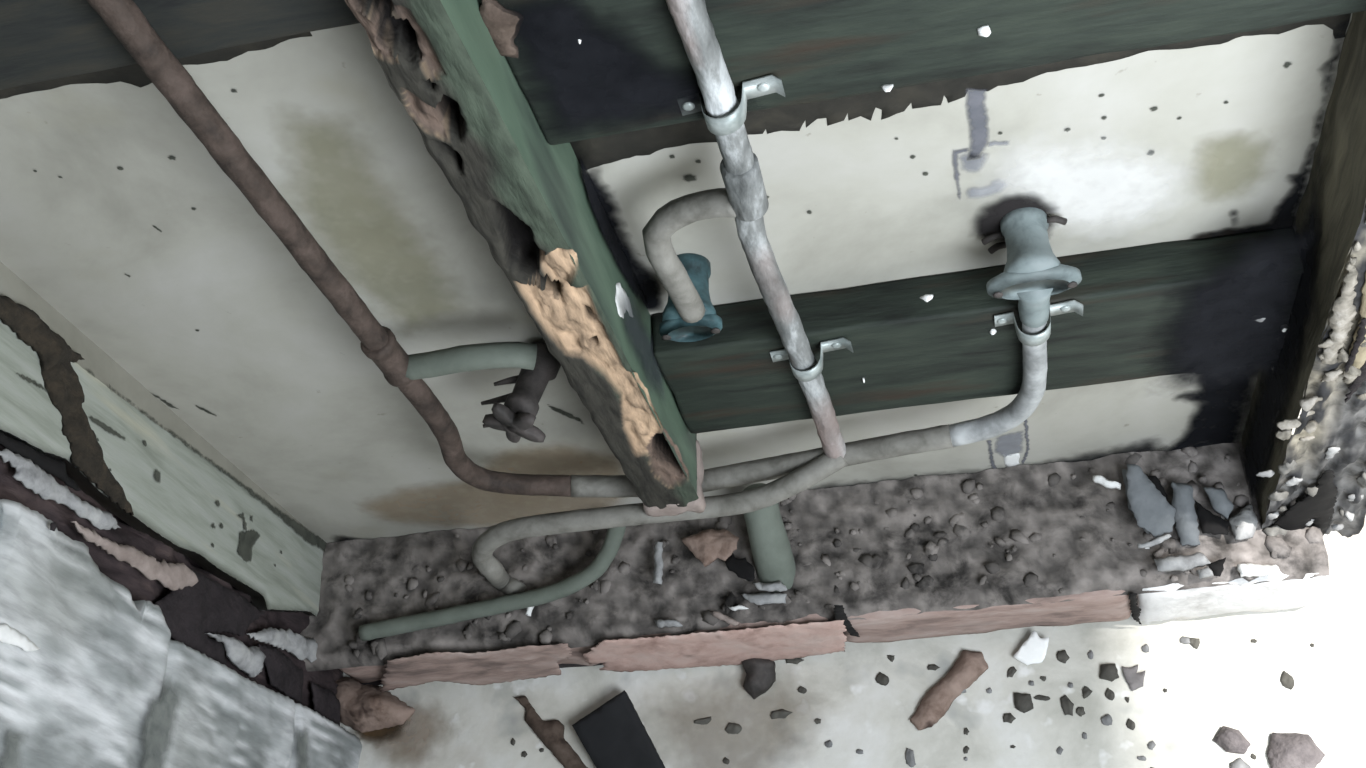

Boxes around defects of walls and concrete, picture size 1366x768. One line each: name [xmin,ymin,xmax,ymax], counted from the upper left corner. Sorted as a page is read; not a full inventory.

peeling [744,13,1351,135]
peeling [570,119,717,170]
peeling [1275,241,1366,442]
peeling [1325,447,1341,460]
flaking render [0,449,198,591]
peeling [1256,460,1318,537]
peeling [1331,463,1366,531]
peeling [0,624,40,652]
flaking render [204,627,318,677]